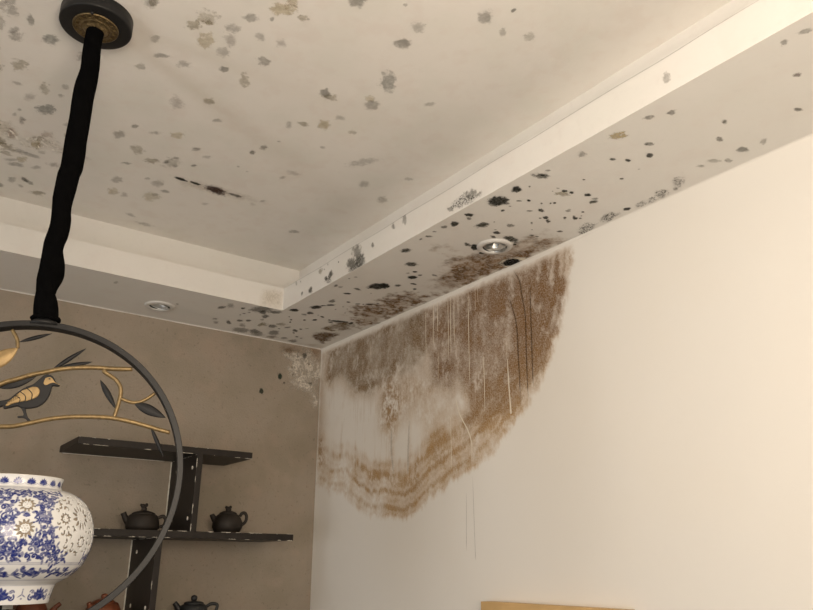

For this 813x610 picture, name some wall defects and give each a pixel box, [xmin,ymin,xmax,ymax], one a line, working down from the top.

leakage [226,186,594,524]